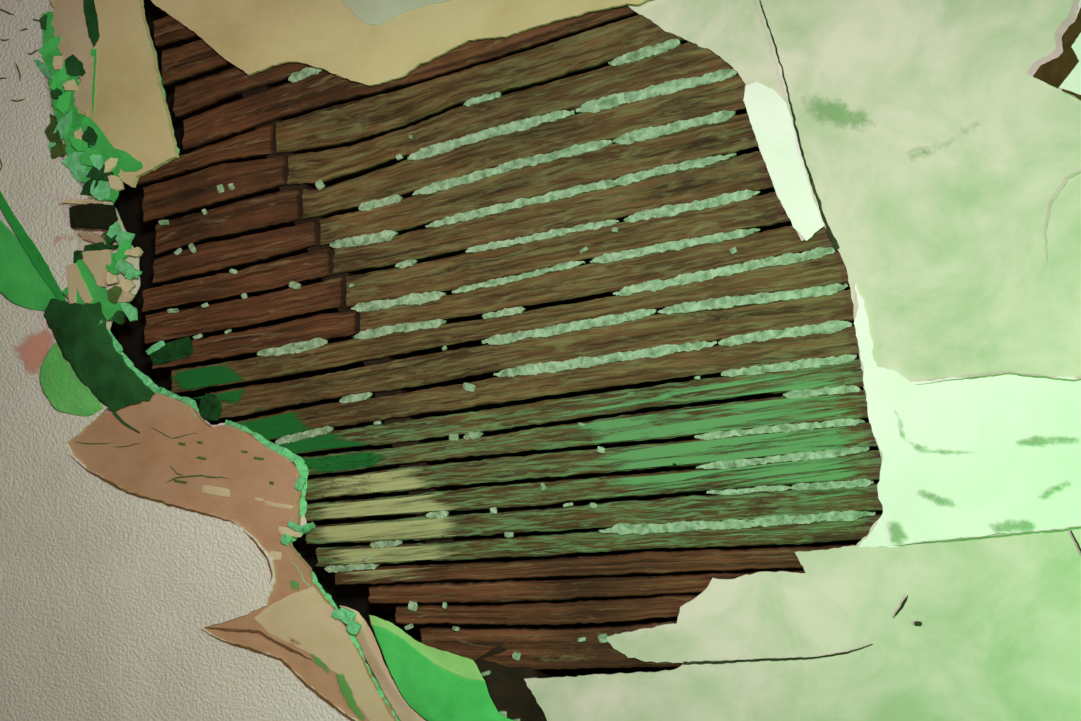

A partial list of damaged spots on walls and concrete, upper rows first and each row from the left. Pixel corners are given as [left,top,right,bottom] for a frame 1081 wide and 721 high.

crack [1033,8,1081,100]
spalling [33,0,143,204]
crack [1045,172,1081,253]
spalling [0,191,514,721]
crack [898,526,1081,552]